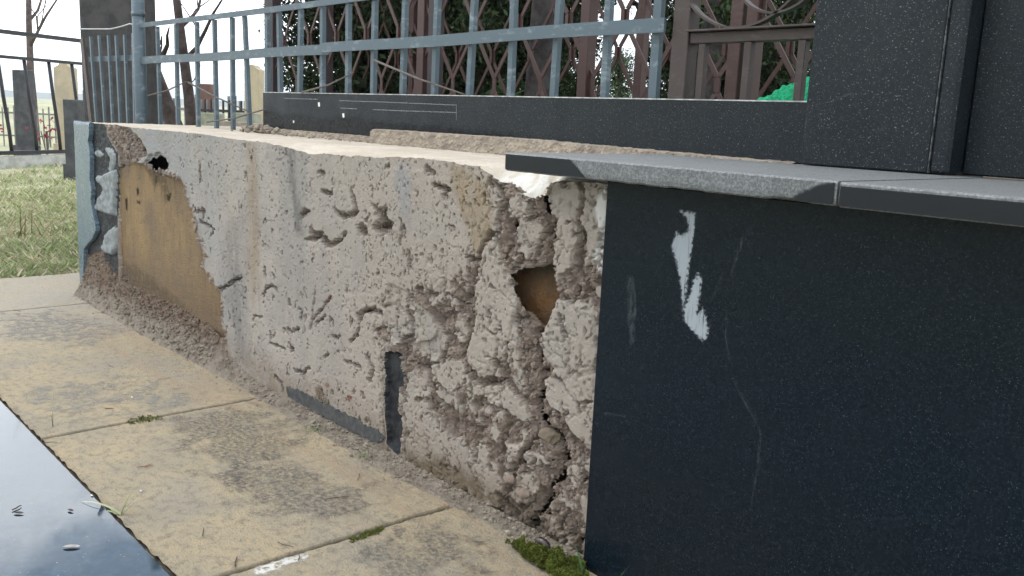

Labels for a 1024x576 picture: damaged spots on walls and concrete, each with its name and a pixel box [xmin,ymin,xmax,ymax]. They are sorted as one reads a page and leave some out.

peeling [105,124,243,346]
hole [424,163,451,201]
spalling [333,176,608,558]
crack [408,182,595,531]